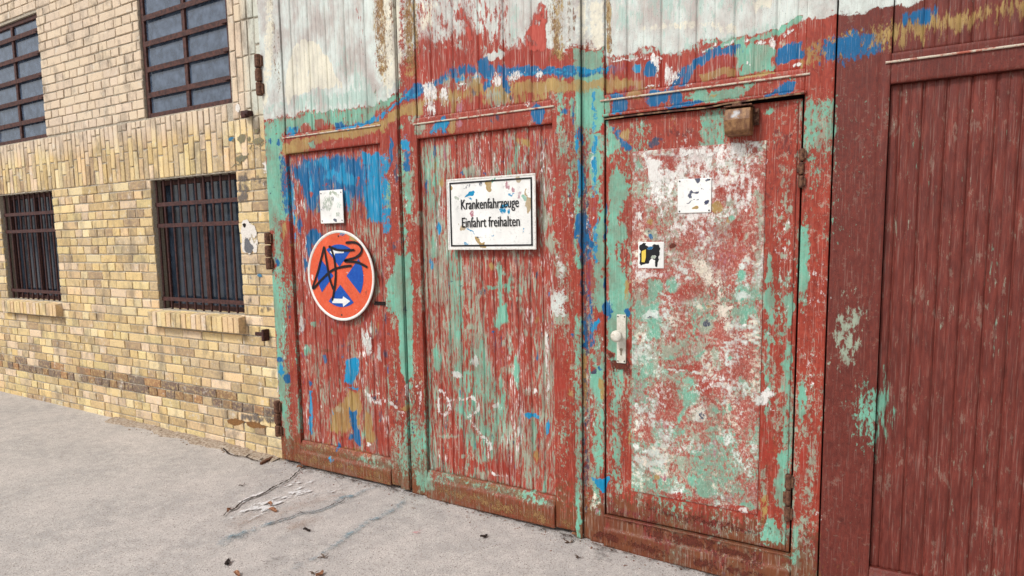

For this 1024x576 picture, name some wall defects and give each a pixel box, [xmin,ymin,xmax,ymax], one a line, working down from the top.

peeling [457,8,500,55]
peeling [525,4,547,53]
peeling [423,80,468,115]
peeling [492,69,543,87]
peeling [613,56,680,88]
peeling [643,141,753,218]
peeling [690,256,761,341]
peeling [759,391,775,411]
crack [222,464,304,516]